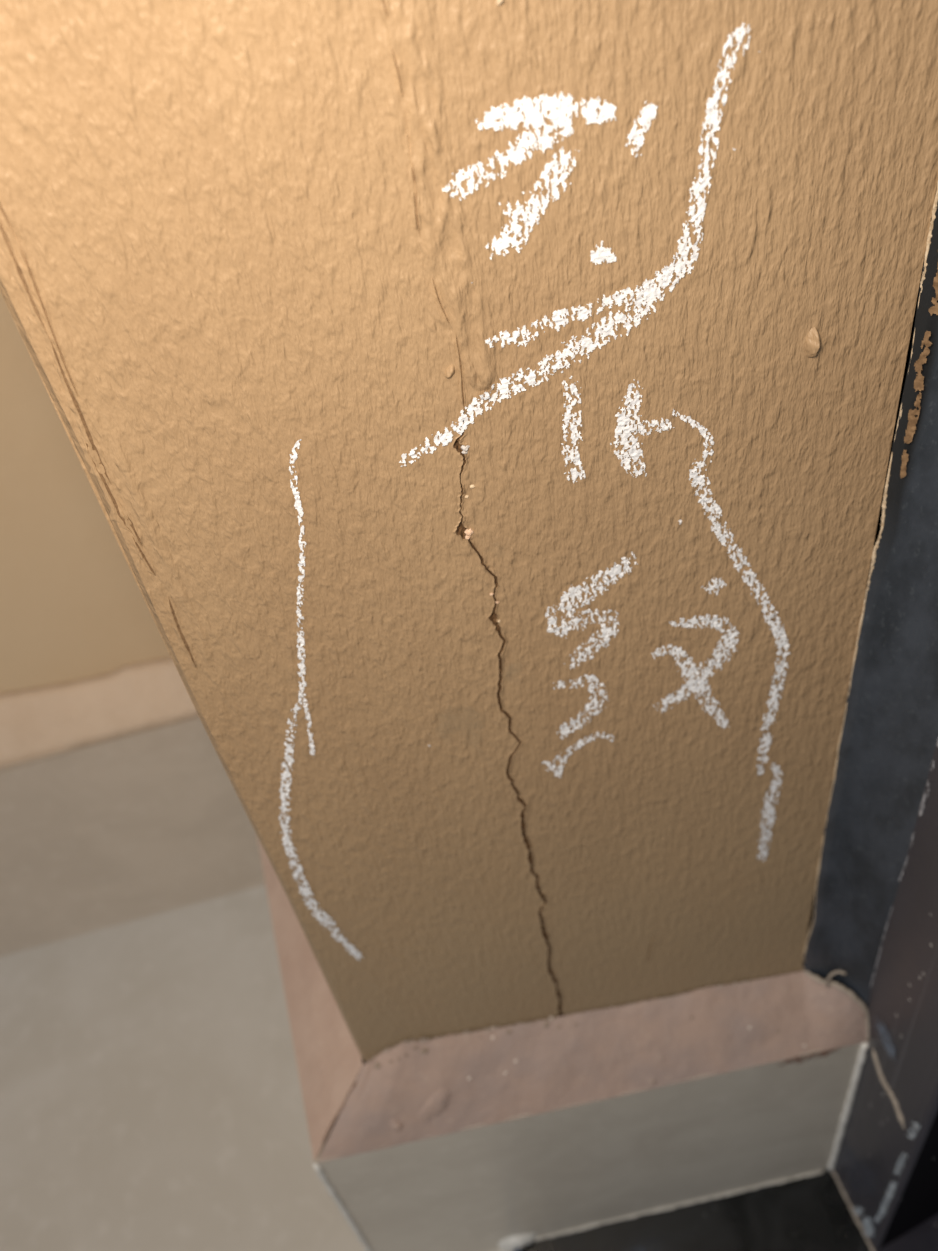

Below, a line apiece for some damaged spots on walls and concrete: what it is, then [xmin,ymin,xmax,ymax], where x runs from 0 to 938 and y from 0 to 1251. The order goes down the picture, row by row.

crack [380,0,403,96]
crack [405,127,421,237]
crack [432,278,566,1017]